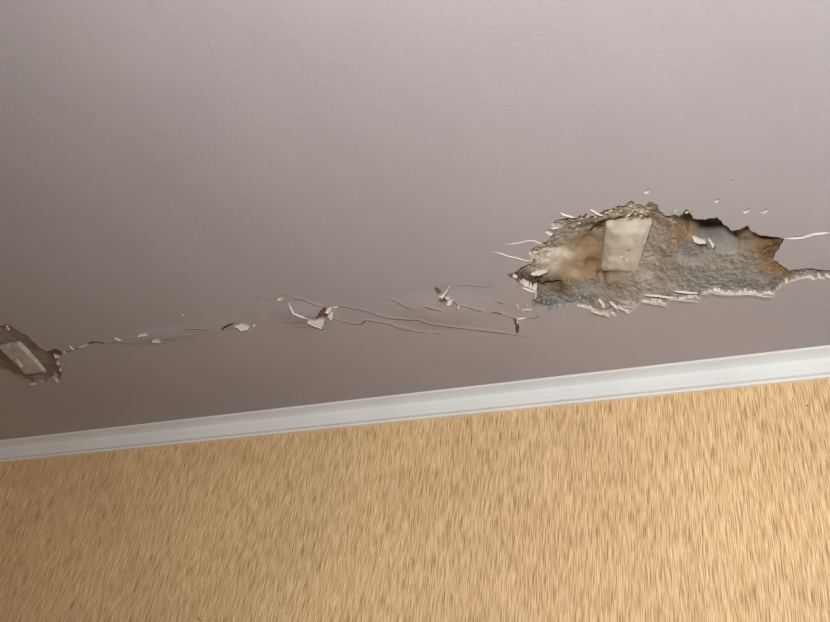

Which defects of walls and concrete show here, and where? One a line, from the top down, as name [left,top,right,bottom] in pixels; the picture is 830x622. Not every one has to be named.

crack [785,232,830,241]
spalling [495,189,830,320]
peeling [307,306,338,330]
crack [253,281,540,338]
peeling [435,283,460,309]
spalling [0,324,65,385]
crack [63,328,223,355]